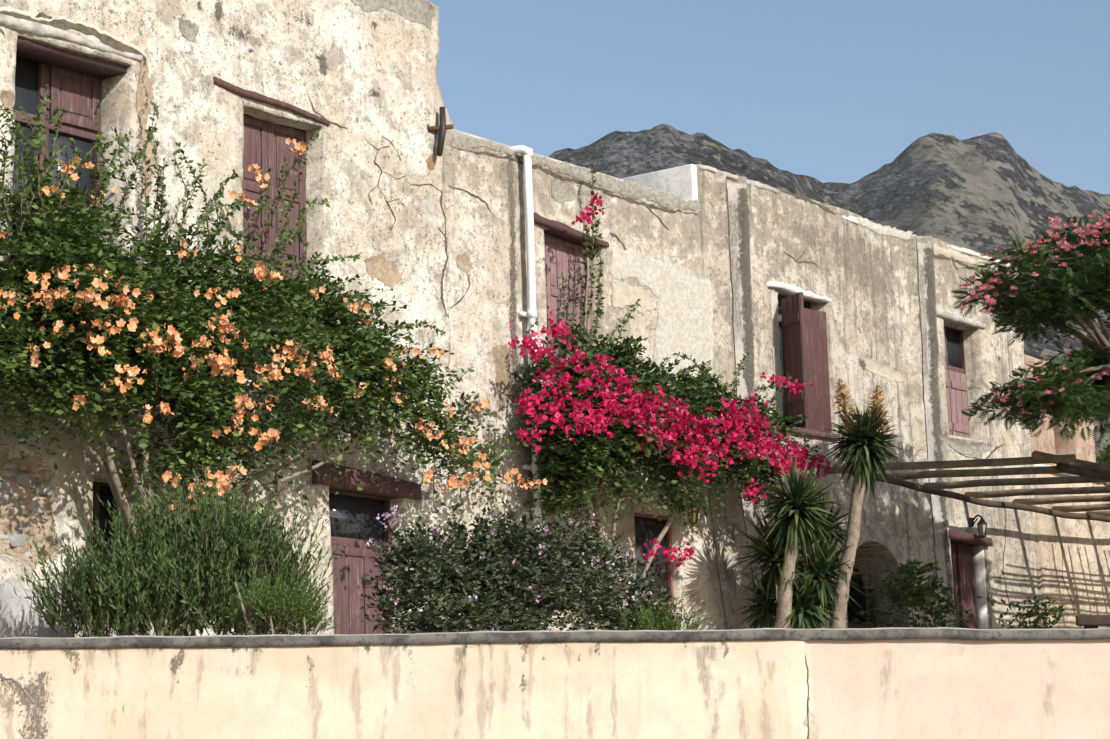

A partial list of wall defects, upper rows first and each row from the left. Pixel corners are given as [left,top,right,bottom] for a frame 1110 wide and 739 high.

crack [309,97,492,317]
peeling [0,455,61,569]
damp [0,671,63,739]
crack [803,654,811,739]